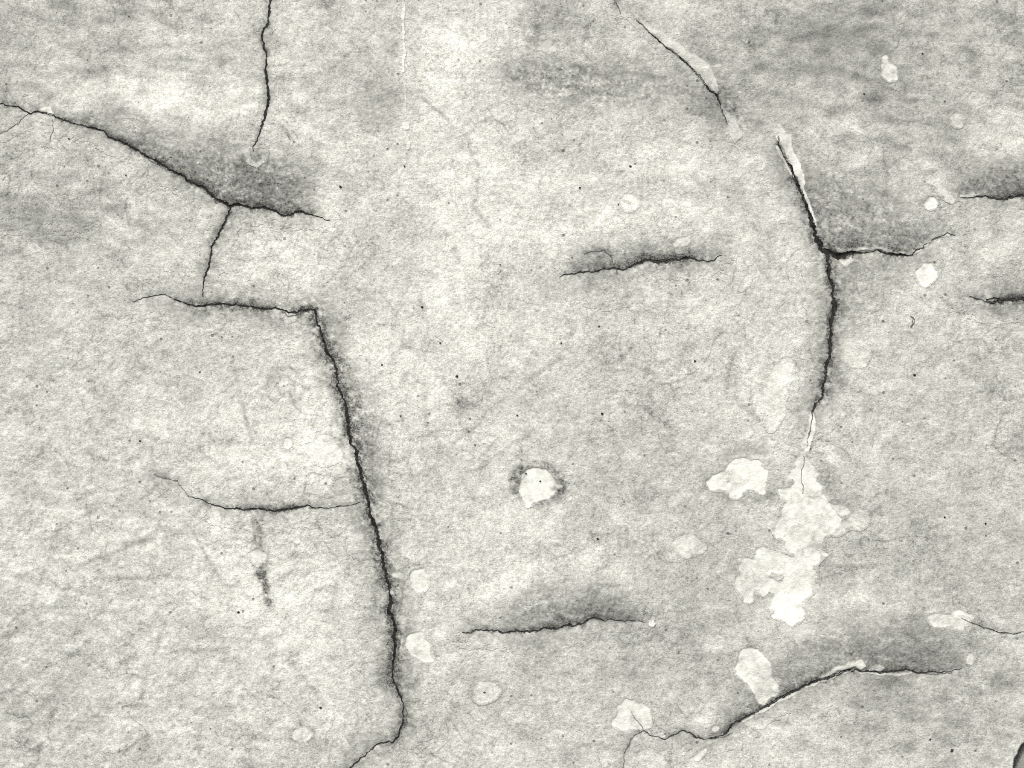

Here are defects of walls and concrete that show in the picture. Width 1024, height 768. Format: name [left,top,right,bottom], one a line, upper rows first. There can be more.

crack [542,233,737,294]
crack [606,0,1024,494]
crack [0,0,655,768]
spalling [516,464,572,508]
spalling [704,445,871,645]
spalling [732,644,781,706]
crack [606,651,975,768]